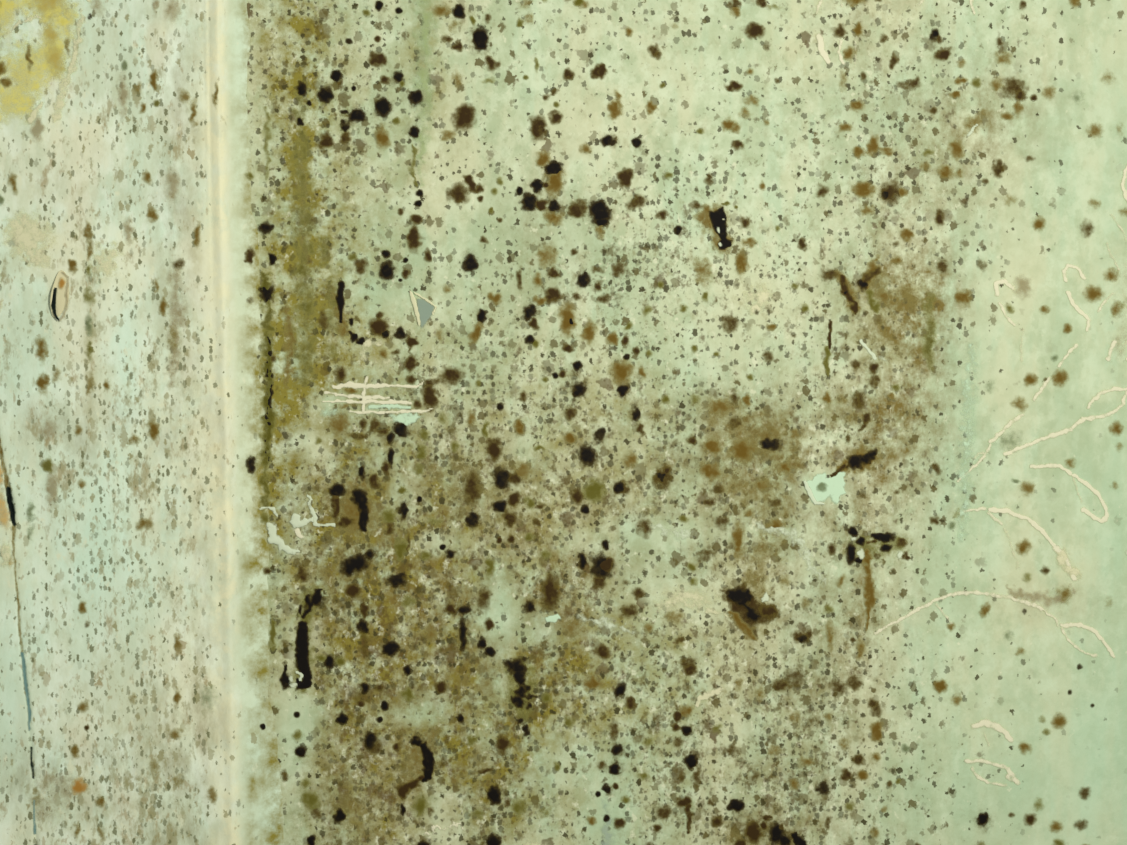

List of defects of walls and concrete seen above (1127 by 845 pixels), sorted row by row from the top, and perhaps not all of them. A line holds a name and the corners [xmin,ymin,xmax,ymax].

leakage [340,97,425,207]
leakage [517,160,563,213]
mould [696,201,738,253]
leakage [246,70,365,523]
peeling [410,291,437,327]
peeling [390,412,420,426]
peeling [804,472,846,505]
peeling [260,495,335,555]
crack [0,439,36,845]
leakage [280,588,345,693]
mould [721,571,778,641]
mould [847,527,911,631]